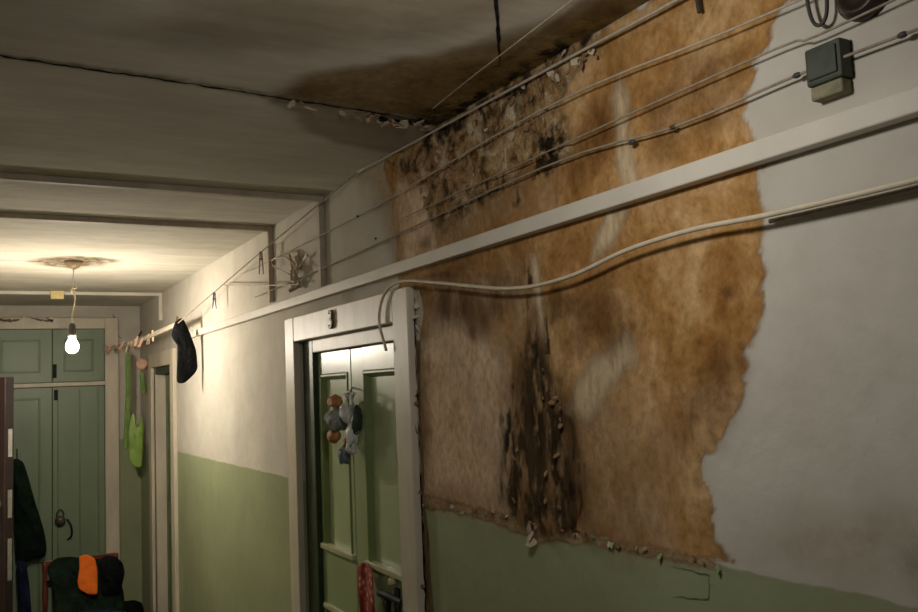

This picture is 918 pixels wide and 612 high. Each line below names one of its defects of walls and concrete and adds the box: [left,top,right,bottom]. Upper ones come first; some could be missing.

crack [0,55,429,131]
flaking render [386,34,597,225]
crack [493,0,501,67]
leakage [277,0,787,262]
leakage [398,164,766,562]